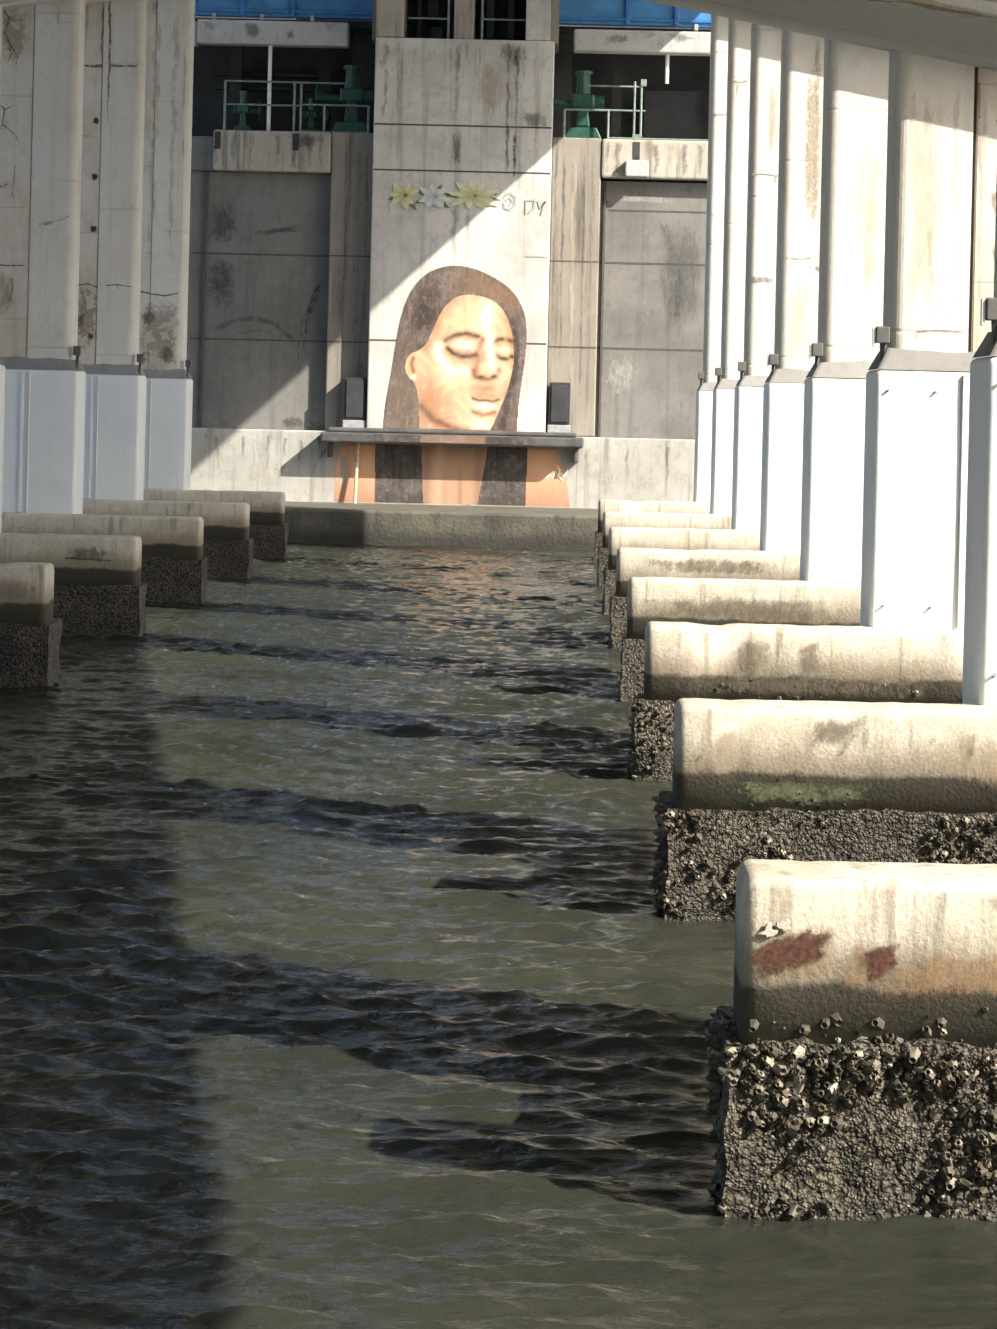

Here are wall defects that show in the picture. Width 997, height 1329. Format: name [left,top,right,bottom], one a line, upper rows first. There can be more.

peeling [140,291,181,371]
water stain [813,720,867,748]
rust [753,919,832,977]
rust [843,944,900,984]